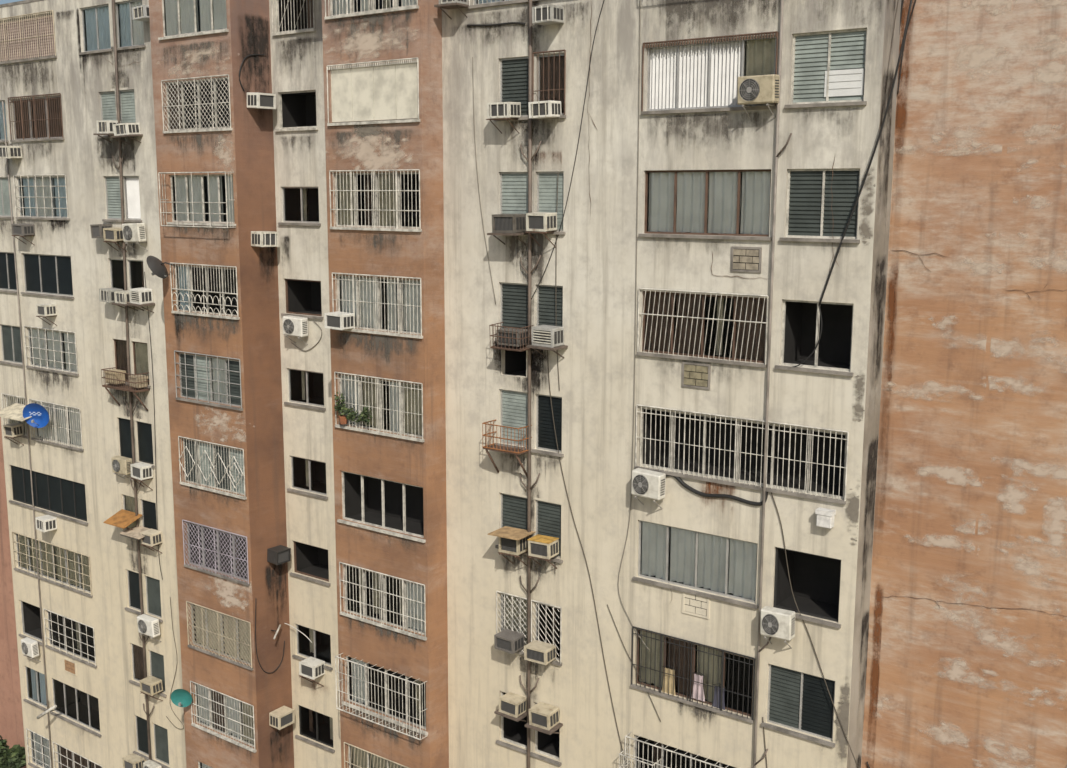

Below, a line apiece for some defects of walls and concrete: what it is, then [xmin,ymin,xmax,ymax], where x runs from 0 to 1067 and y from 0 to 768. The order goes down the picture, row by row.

leakage [660,0,776,32]
leakage [241,16,311,93]
leakage [510,119,550,143]
leakage [509,234,546,281]
peeling [919,467,981,486]
peeling [1014,459,1067,479]
peeling [998,485,1037,514]
peeling [925,514,983,550]
peeling [1026,497,1067,552]
crack [885,596,1067,617]